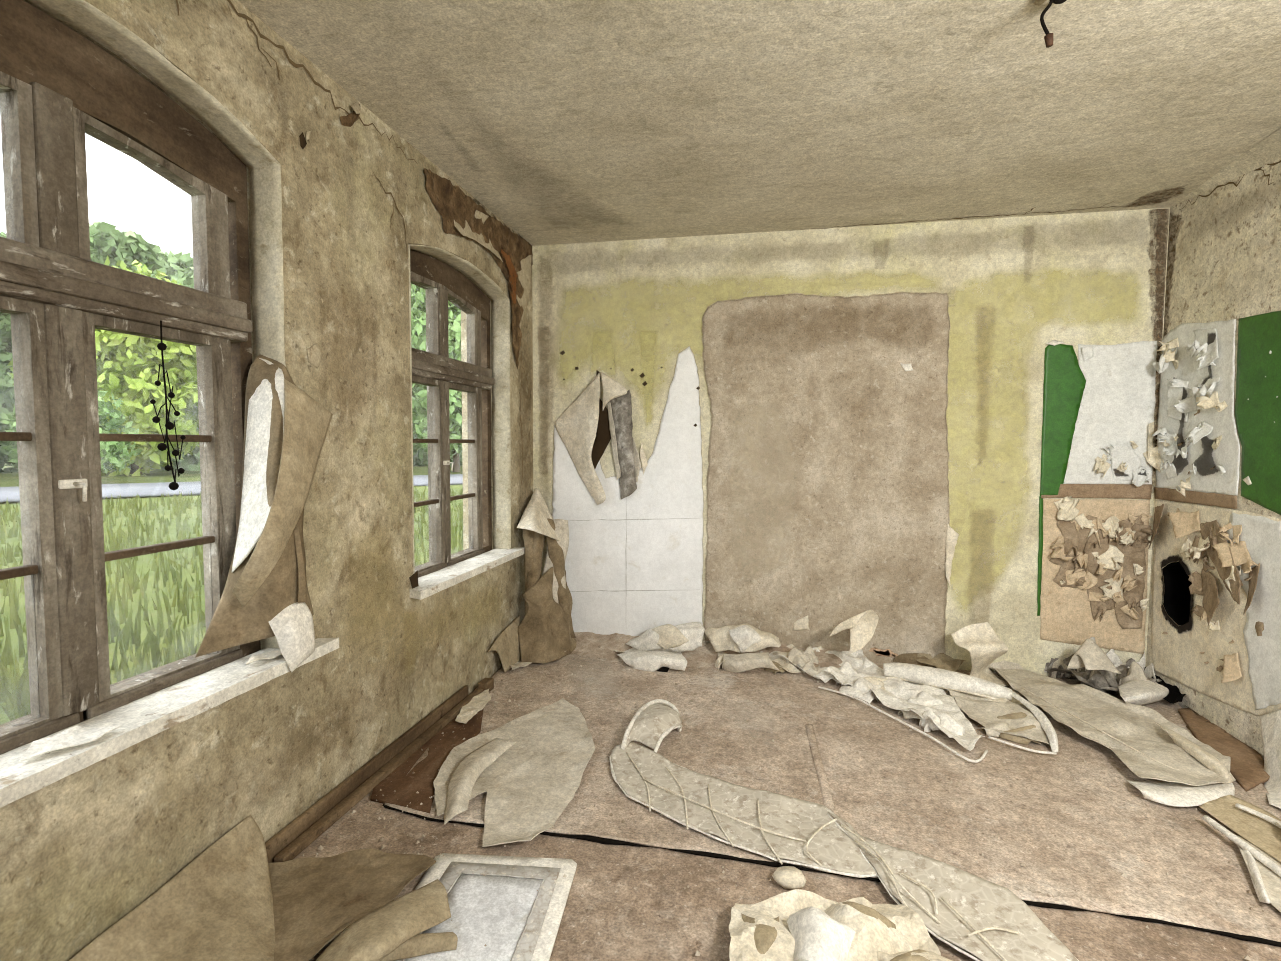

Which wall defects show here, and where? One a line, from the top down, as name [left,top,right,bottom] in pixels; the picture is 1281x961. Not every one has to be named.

crack [227,0,417,163]
crack [372,170,407,246]
spalling [424,168,533,369]
water stain [1127,187,1184,447]
peeling [640,443,648,474]
peeling [1037,311,1281,716]